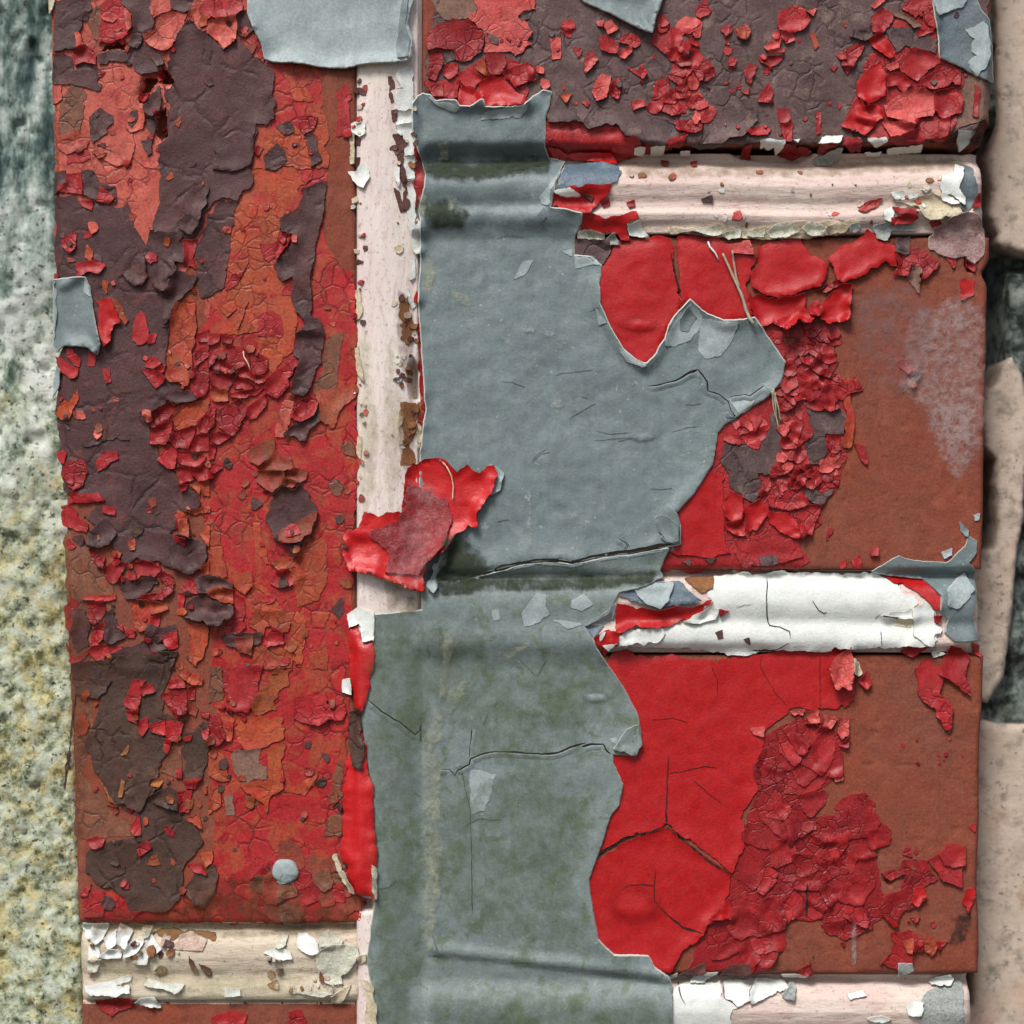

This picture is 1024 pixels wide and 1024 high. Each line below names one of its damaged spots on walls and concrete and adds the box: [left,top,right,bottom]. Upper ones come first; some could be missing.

peeling [48,0,504,976]
peeling [360,0,994,1024]
crack [485,539,674,578]
crack [736,581,790,702]
crack [440,714,610,875]
crack [598,758,730,873]
crack [622,872,701,933]
crack [803,884,811,916]
peeling [84,975,162,1017]
peeling [144,965,185,994]
peeling [263,934,293,990]
peeling [287,929,366,1004]